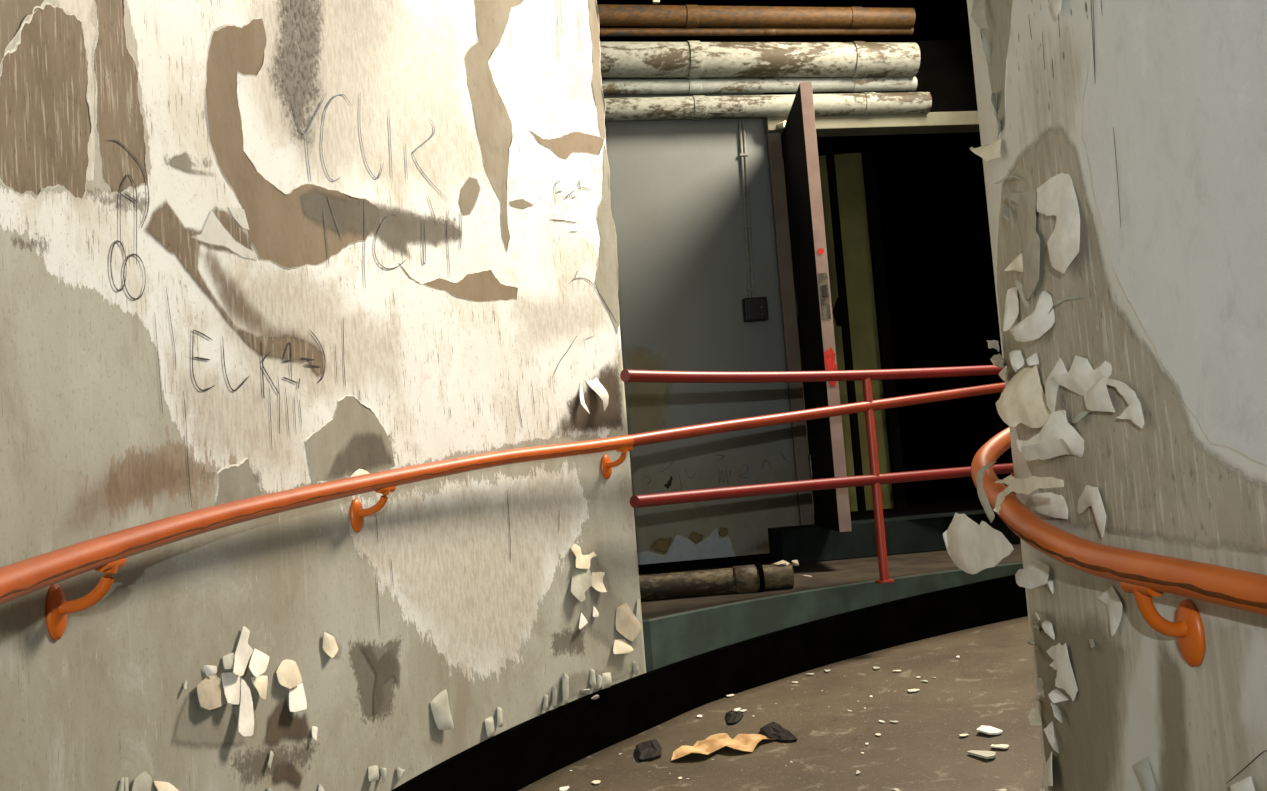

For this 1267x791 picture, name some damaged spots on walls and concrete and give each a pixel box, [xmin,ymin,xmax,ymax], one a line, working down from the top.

peeling [0,0,148,201]
peeling [146,17,382,376]
peeling [398,263,518,302]
peeling [459,0,534,253]
peeling [529,0,620,334]
peeling [943,0,1267,637]
peeling [0,395,625,599]
peeling [120,771,179,791]
peeling [173,626,307,747]
peeling [322,632,341,658]
peeling [571,544,642,654]
peeling [1026,610,1078,791]